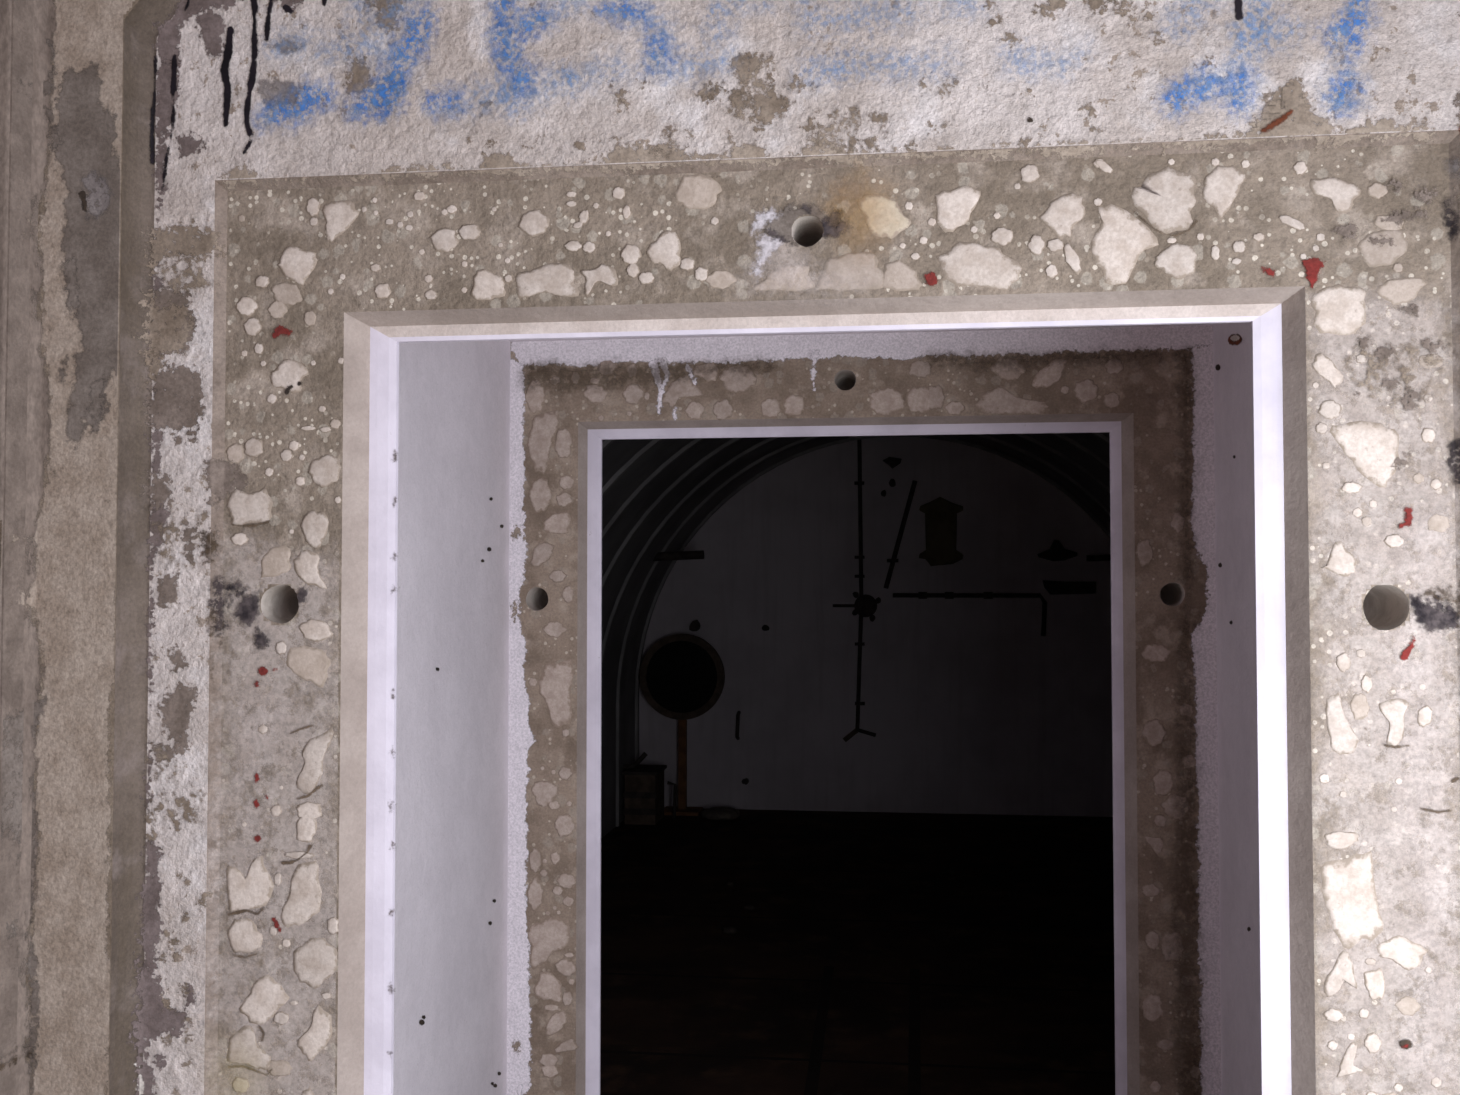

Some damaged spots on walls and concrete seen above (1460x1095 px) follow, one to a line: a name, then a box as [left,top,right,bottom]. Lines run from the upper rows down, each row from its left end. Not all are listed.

peeling [369,0,406,35]
peeling [983,0,1023,45]
peeling [1032,0,1165,46]
spalling [218,51,1453,526]
spalling [123,0,342,1095]
spalling [1322,541,1356,577]
spalling [1383,534,1404,548]
spalling [1325,649,1432,755]
spalling [1319,774,1347,798]
spalling [1320,831,1433,1077]